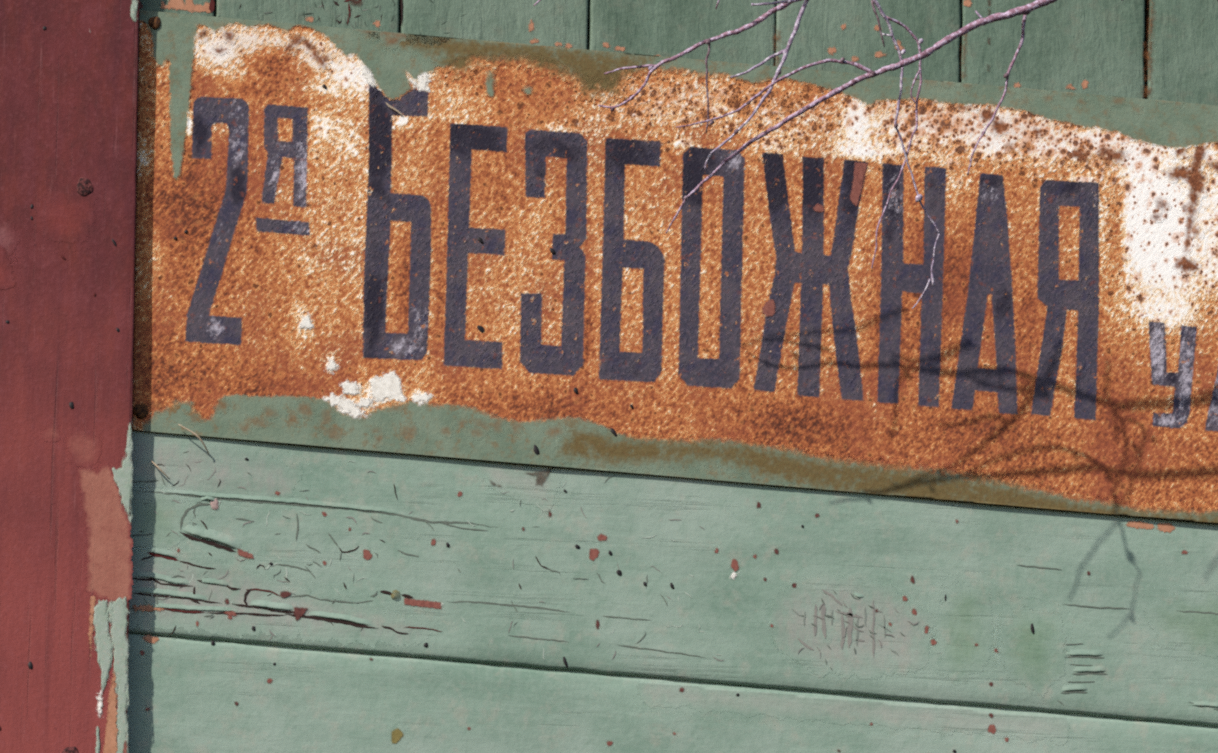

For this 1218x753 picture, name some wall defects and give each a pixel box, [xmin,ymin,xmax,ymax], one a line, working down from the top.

peeling [130,0,143,21]
peeling [161,0,210,13]
rust [196,26,239,56]
rust [282,32,333,76]
rust [354,29,661,105]
rust [954,104,1016,154]
rust [1069,143,1129,168]
rust [1148,143,1218,277]
rust [186,396,344,443]
rust [369,399,419,448]
rust [543,416,1218,523]
peeling [41,424,442,753]